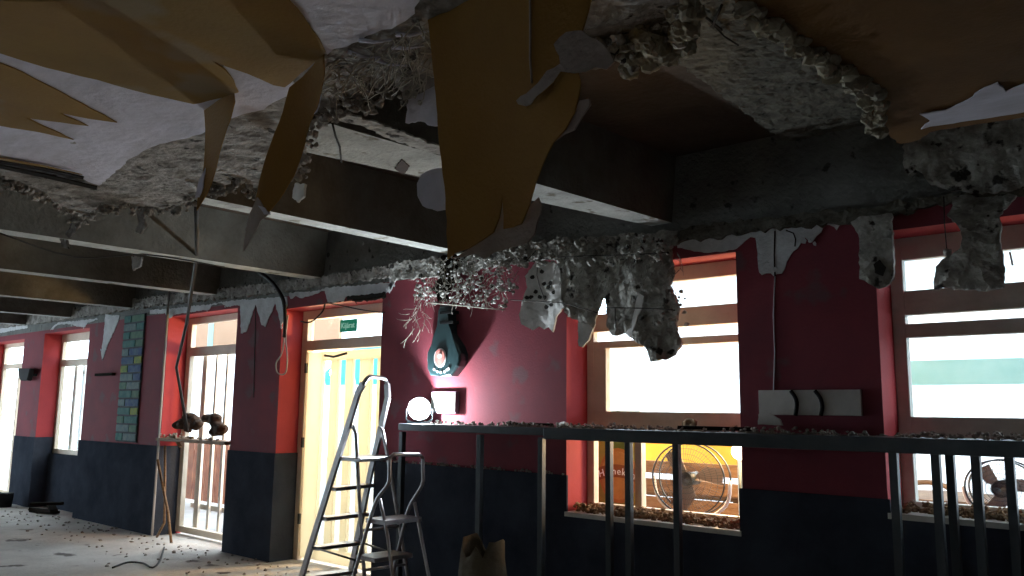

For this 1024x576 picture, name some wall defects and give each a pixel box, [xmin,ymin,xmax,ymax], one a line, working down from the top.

peeling [0,0,468,252]
spalling [583,0,872,141]
spalling [902,82,1024,194]
spalling [0,224,840,360]